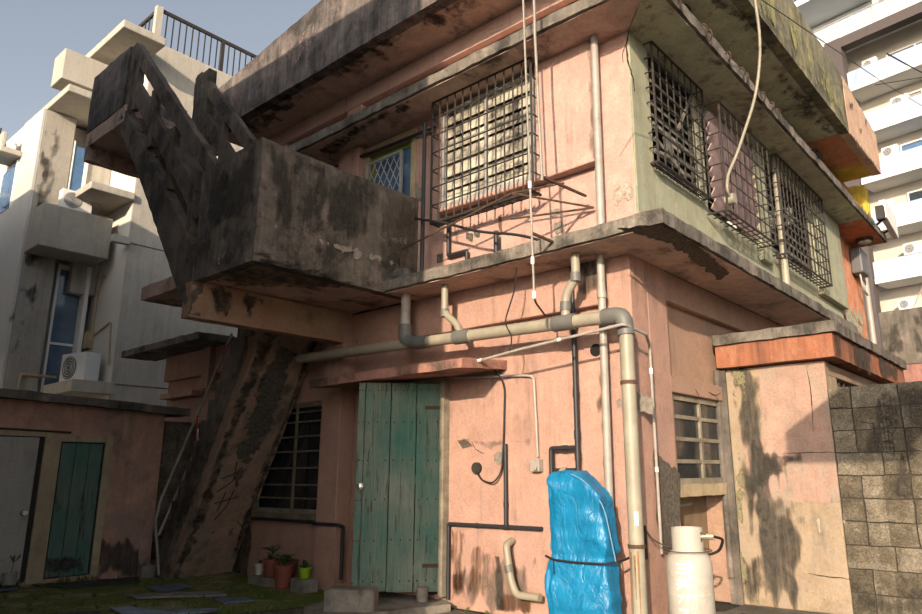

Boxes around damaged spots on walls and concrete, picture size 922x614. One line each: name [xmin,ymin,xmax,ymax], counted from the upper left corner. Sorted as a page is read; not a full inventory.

water stain [424,3,466,26]
water stain [272,152,292,225]
water stain [316,167,367,234]
peeling [319,237,398,265]
spalling [618,225,729,280]
water stain [869,389,922,452]
water stain [174,332,278,579]
water stain [230,341,317,575]
spalling [653,450,681,555]
water stain [731,367,800,607]
rust [450,547,480,595]
rust [502,594,530,613]